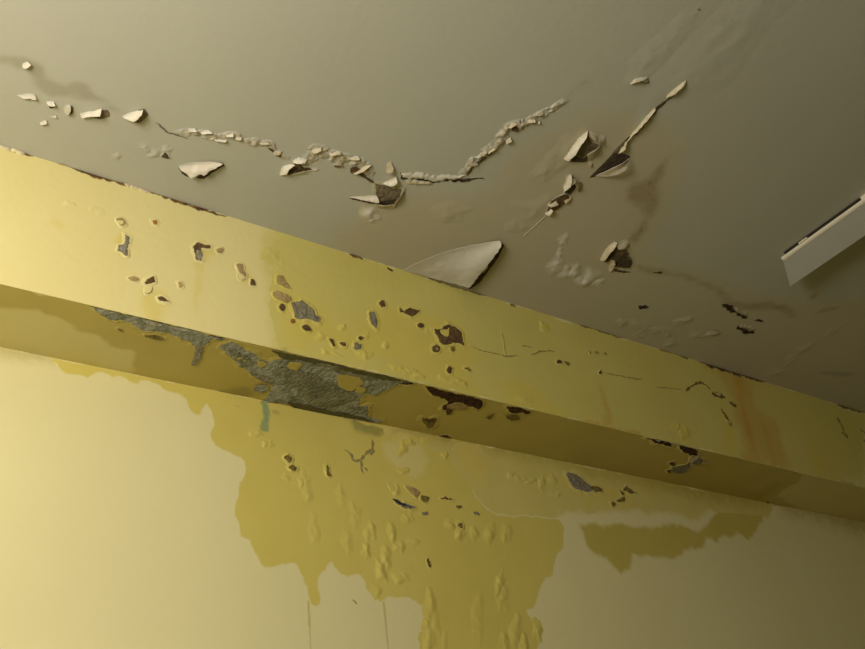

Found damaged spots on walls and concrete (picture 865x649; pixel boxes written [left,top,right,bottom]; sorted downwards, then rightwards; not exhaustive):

peeling [40,101,110,125]
peeling [160,152,224,179]
peeling [173,128,406,209]
peeling [523,80,686,237]
peeling [404,241,504,289]
spalling [599,239,636,273]
spalling [89,305,409,424]
spalling [367,299,467,355]
crack [604,349,765,426]
rust [694,360,795,471]
crack [343,439,375,474]
water stain [0,285,865,649]